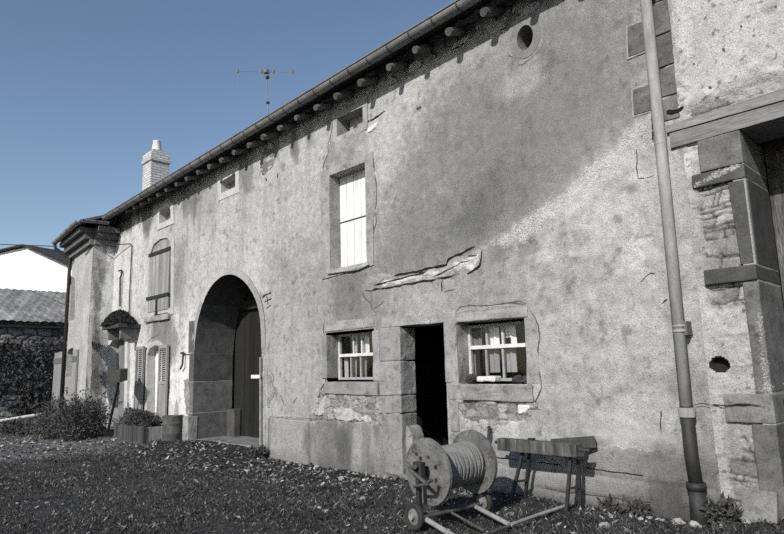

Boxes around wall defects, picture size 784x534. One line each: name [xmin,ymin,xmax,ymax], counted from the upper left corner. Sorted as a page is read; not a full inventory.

crack [367,111,385,133]
flaking render [312,389,387,424]
flaking render [456,399,539,432]